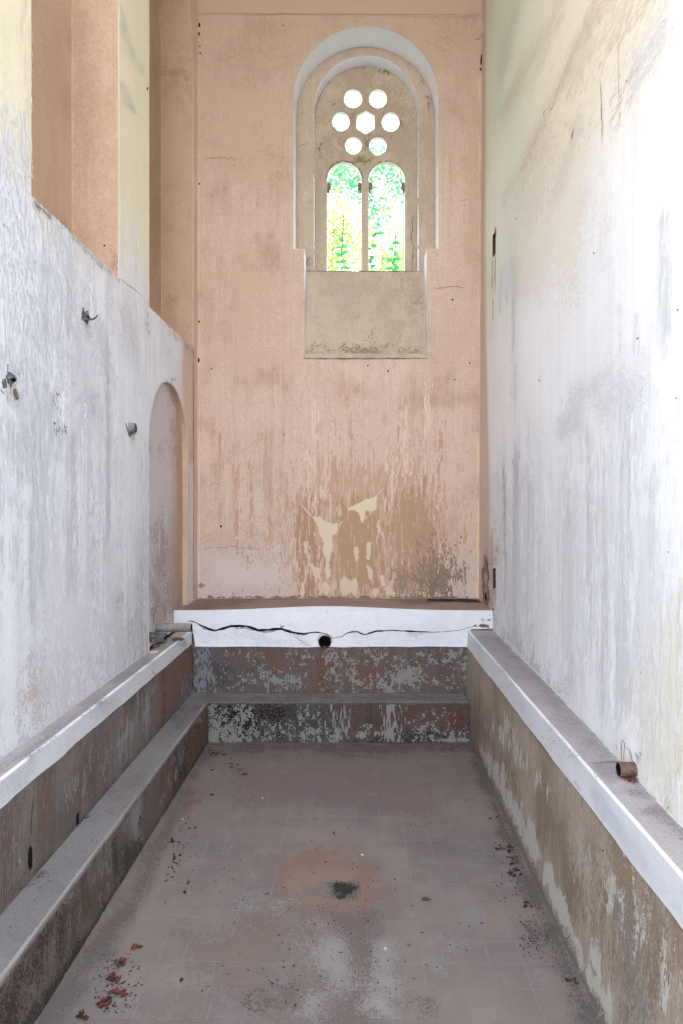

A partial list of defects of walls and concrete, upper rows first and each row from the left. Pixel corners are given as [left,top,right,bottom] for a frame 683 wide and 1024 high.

water stain [0,0,482,651]
crack [153,398,490,646]
peeling [300,468,400,597]
water stain [484,0,683,822]
water stain [0,809,147,1024]
water stain [0,681,157,910]
water stain [179,647,683,1024]